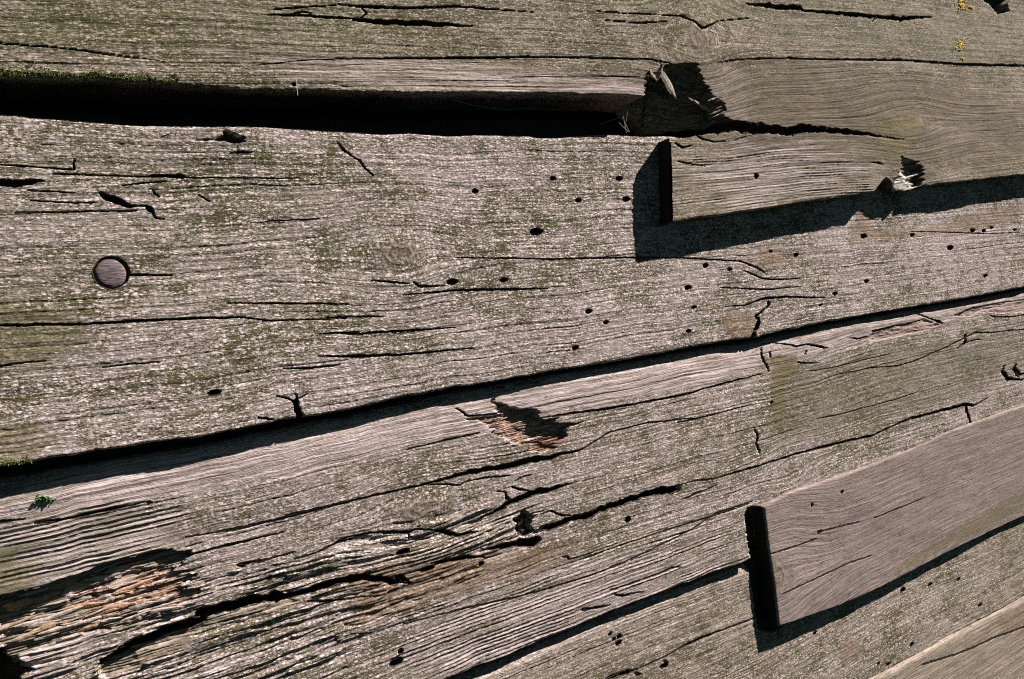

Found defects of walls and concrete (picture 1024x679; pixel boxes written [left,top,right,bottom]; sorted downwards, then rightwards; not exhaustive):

crack [268,5,533,27]
crack [595,3,928,29]
crack [338,144,372,175]
crack [0,151,283,219]
crack [184,257,1024,565]
peeling [497,414,563,440]
crack [406,392,987,624]